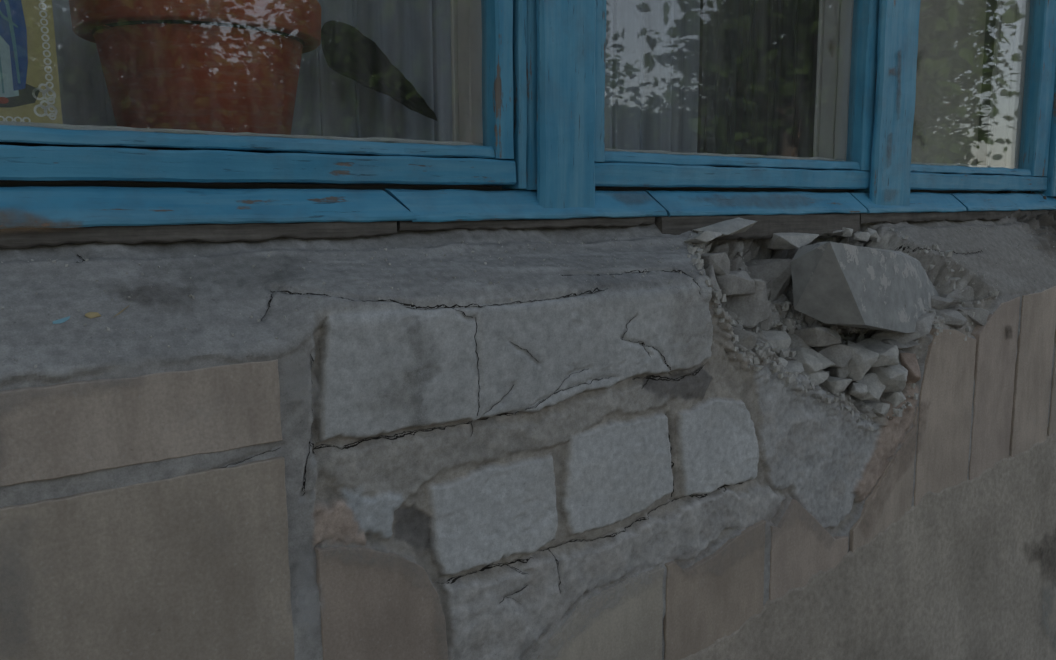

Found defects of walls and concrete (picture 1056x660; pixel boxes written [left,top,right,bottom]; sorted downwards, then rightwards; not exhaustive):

crack [261,269,704,495]
crack [432,432,748,603]
spalling [311,223,1000,660]